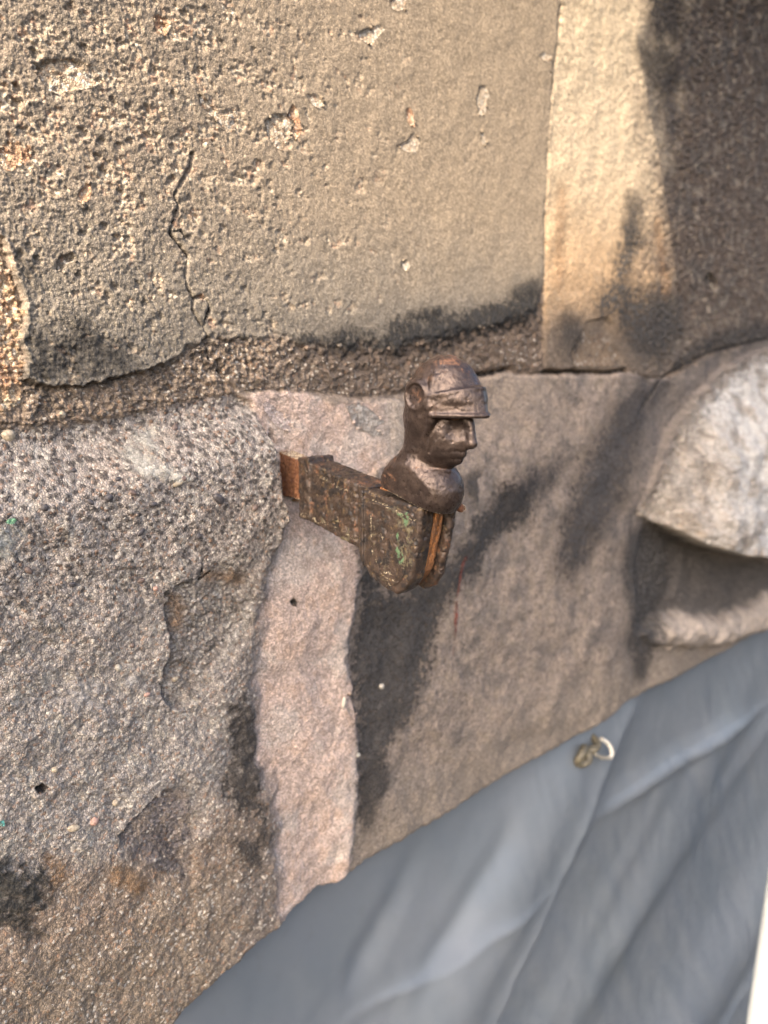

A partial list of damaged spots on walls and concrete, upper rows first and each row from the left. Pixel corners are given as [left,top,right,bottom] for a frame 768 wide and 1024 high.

crack [168,191,187,258]
leakage [555,194,768,585]
leakage [346,464,559,832]